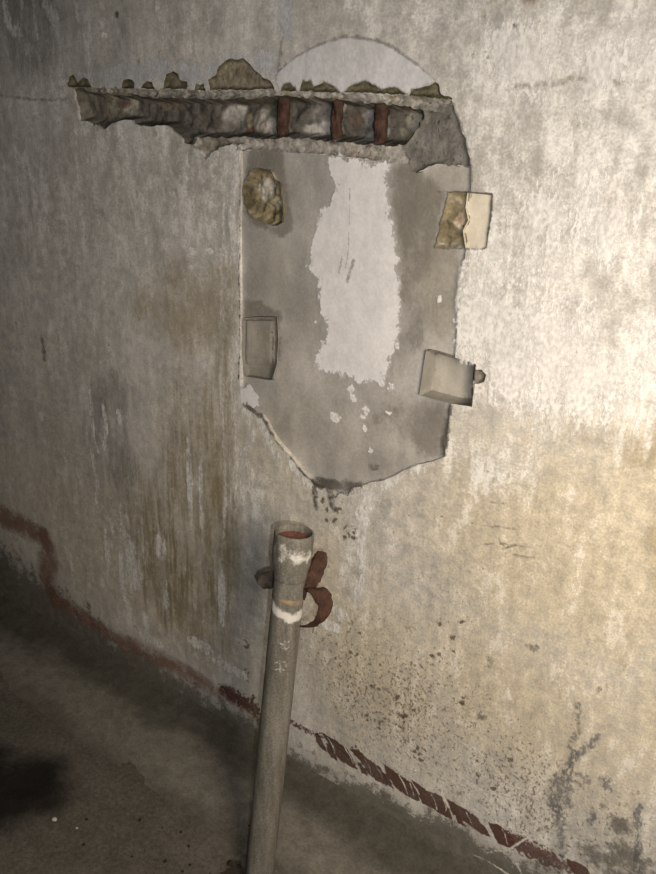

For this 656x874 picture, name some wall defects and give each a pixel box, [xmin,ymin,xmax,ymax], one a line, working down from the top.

rust [276,97,291,137]
rust [330,100,344,144]
rust [373,104,389,144]
spalling [67,58,471,432]
flaking render [316,496,357,540]
leakage [549,703,599,831]
leakage [591,804,654,874]